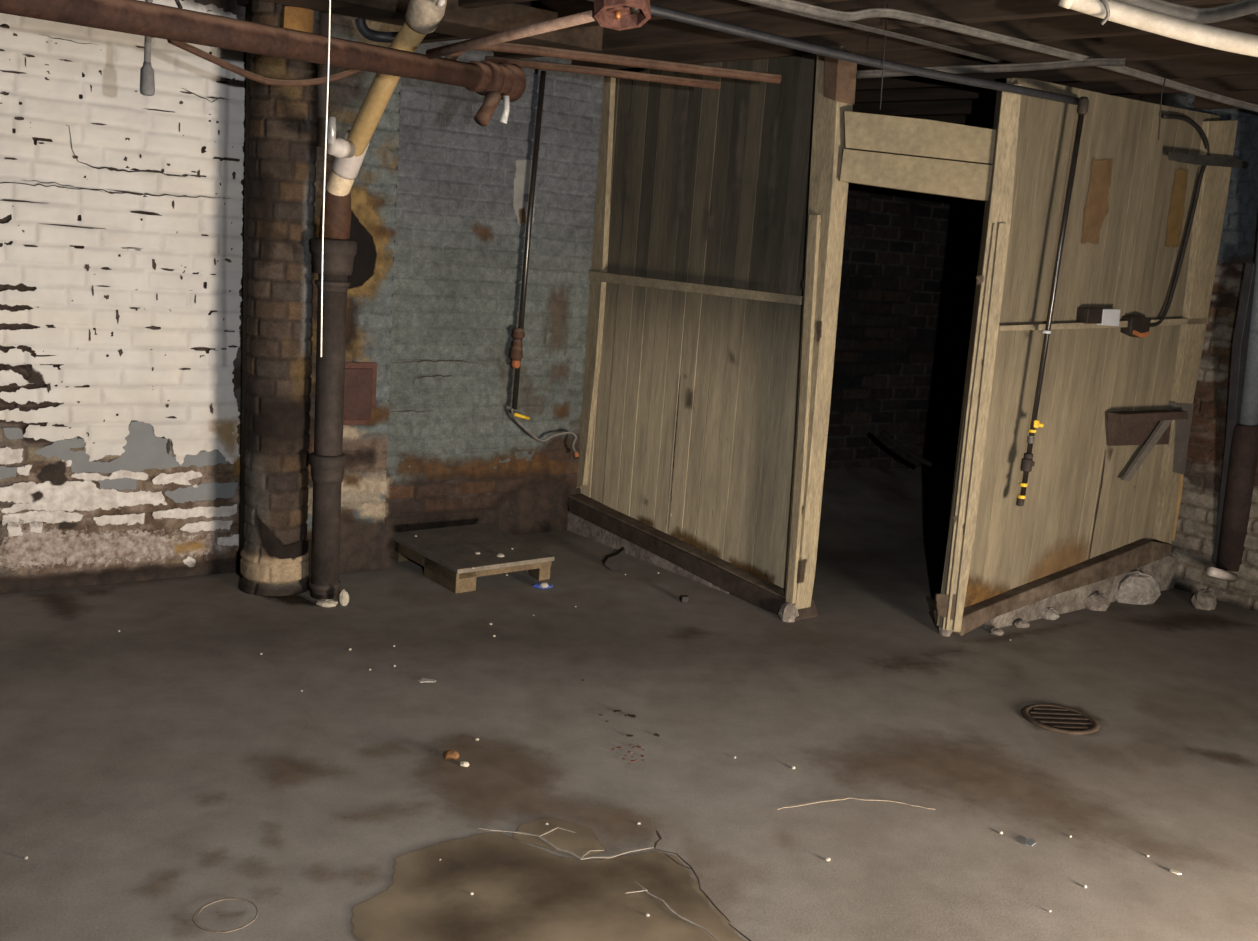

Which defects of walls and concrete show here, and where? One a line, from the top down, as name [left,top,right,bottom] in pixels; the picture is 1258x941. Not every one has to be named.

peeling [139,0,237,19]
peeling [0,13,246,547]
corrosion [398,450,565,477]
spalling [257,515,309,560]
damp [351,818,745,941]
crack [478,827,752,941]